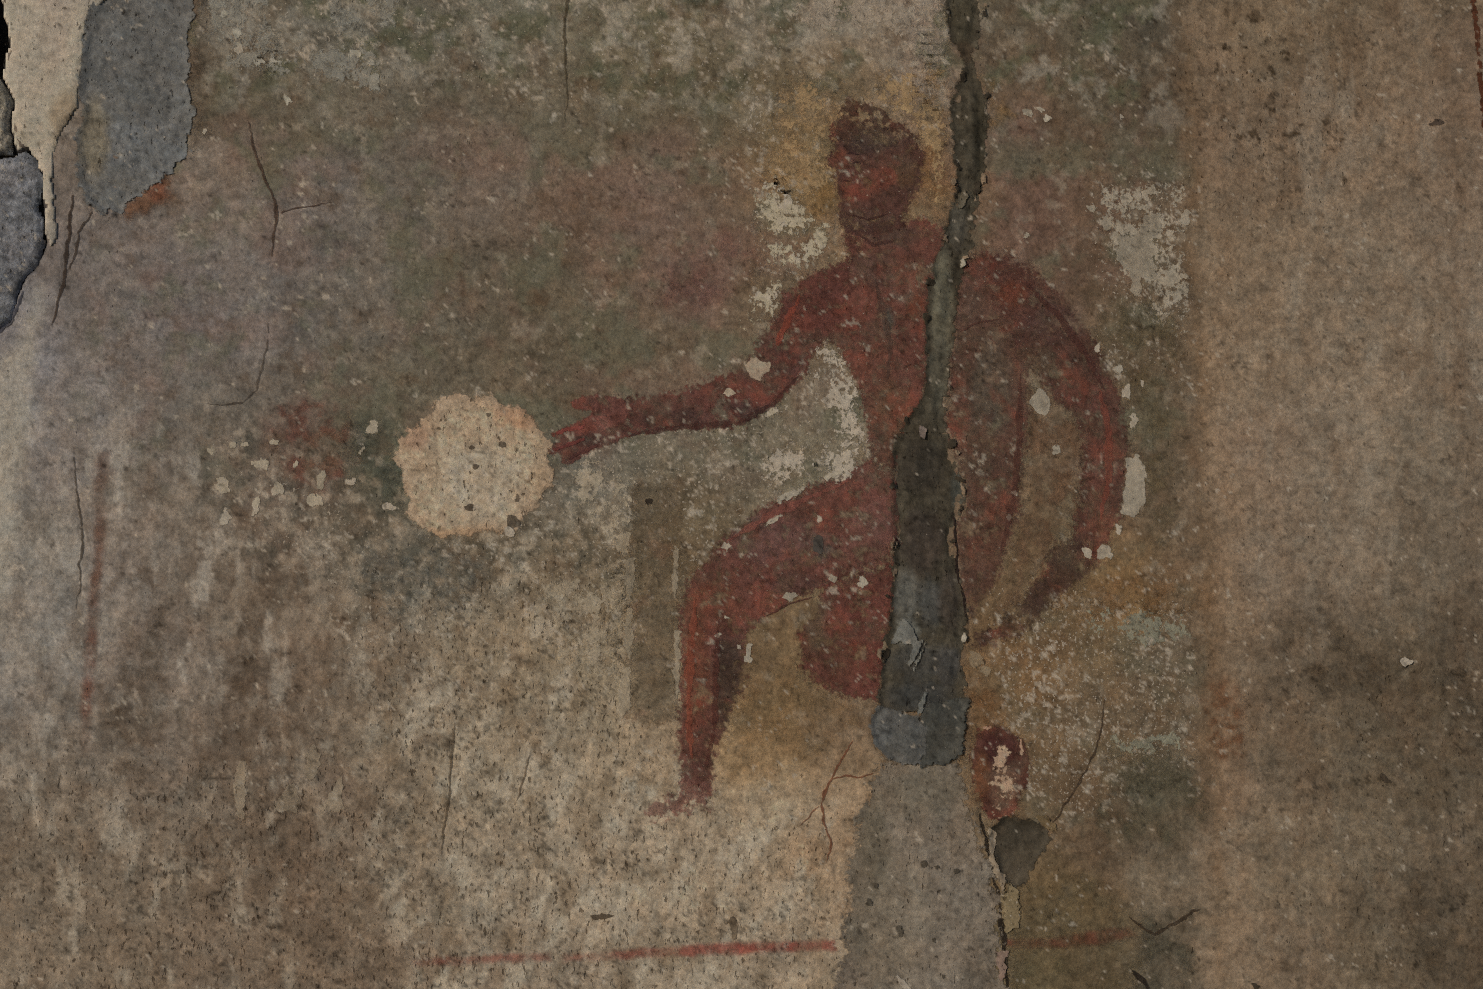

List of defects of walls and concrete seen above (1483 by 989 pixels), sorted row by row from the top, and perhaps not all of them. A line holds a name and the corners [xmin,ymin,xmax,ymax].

peeling [739,82,831,330]
peeling [1086,184,1191,333]
spalling [504,494,520,537]
crack [801,0,990,861]
spalling [987,739,1056,981]